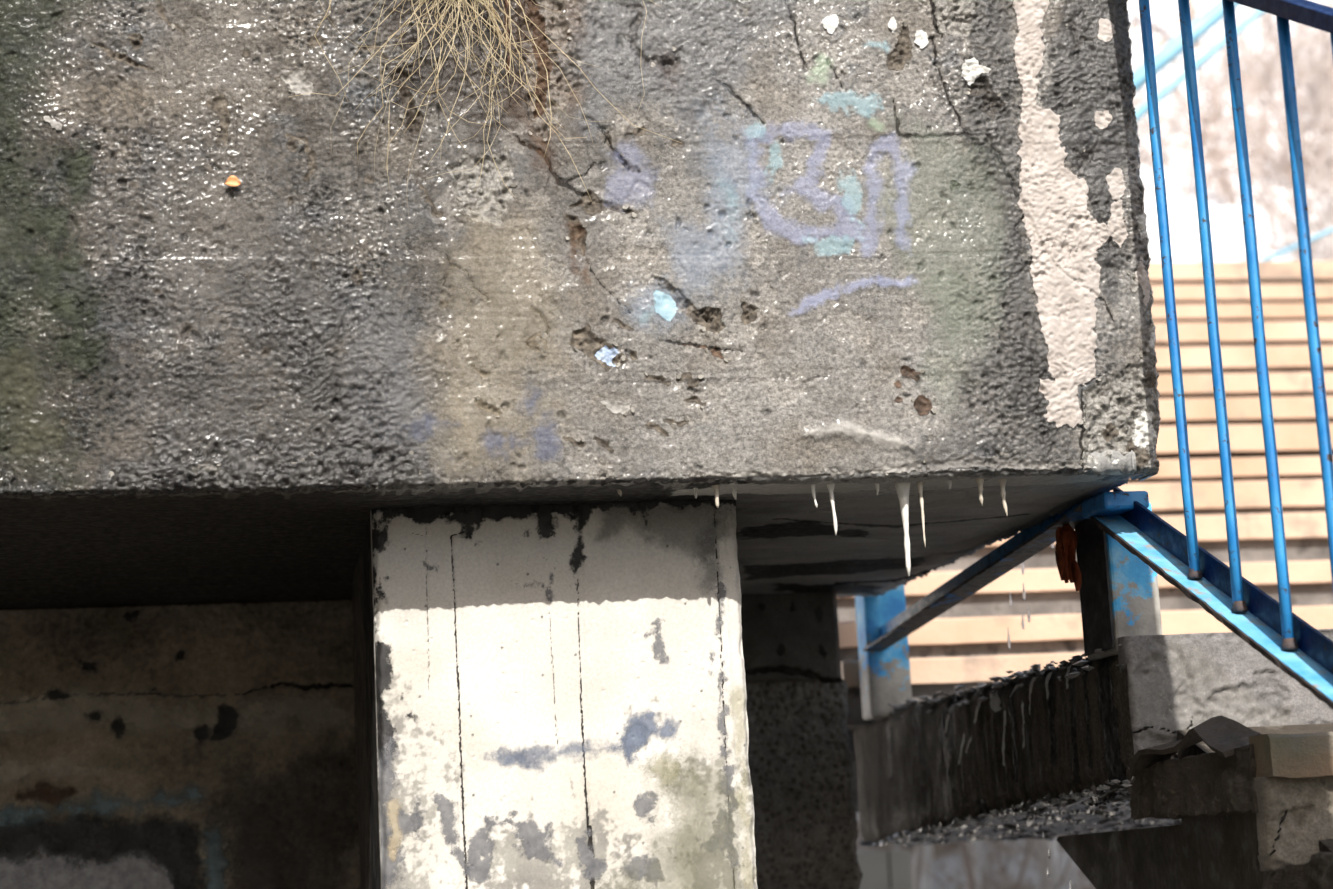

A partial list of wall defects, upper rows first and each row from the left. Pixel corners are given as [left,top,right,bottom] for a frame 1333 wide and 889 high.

crack [515,116,629,196]
crack [716,0,1029,259]
crack [438,307,828,387]
spalling [653,277,728,363]
crack [1098,297,1114,321]
leakage [92,391,432,496]
leakage [1132,406,1157,450]
leakage [371,453,1130,606]
leakage [374,622,416,762]
peeling [378,736,564,889]
peeling [576,830,665,885]
peeling [699,673,740,868]